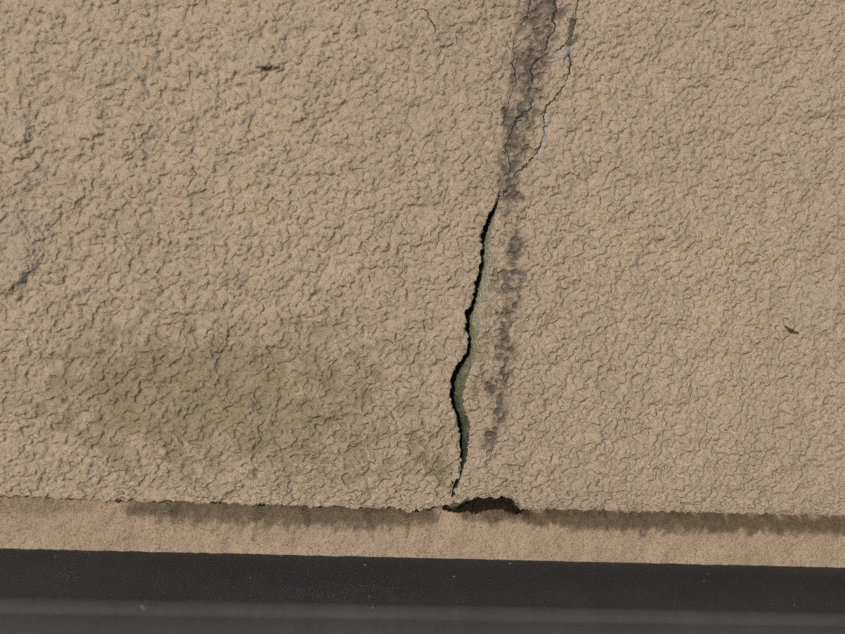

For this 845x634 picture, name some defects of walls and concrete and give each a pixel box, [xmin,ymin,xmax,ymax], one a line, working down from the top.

crack [445,0,579,510]